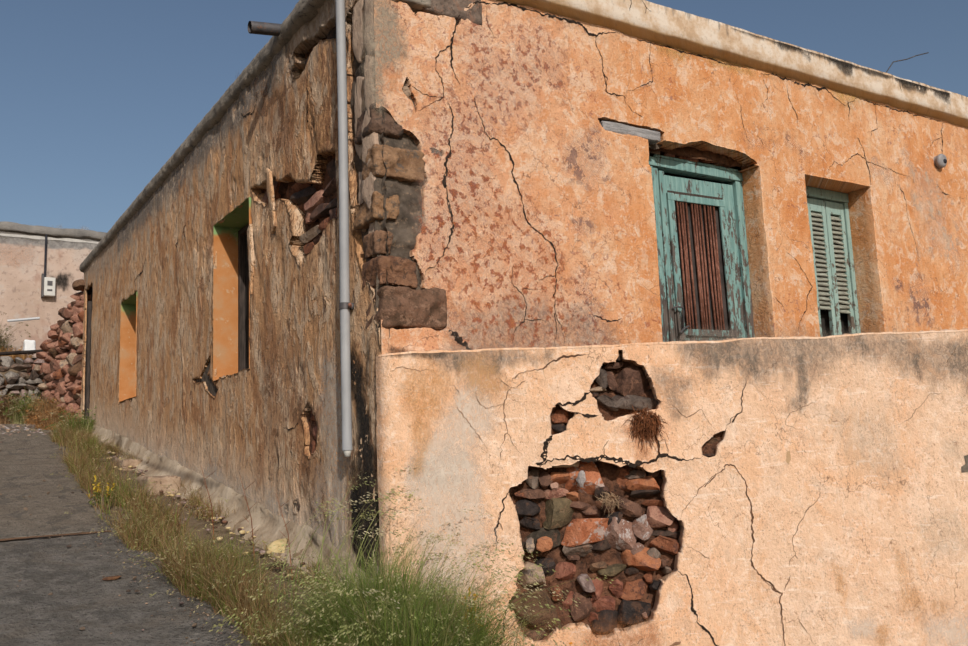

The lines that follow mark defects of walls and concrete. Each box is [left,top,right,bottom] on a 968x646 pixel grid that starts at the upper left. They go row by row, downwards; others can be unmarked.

spalling [261,154,338,256]
spalling [350,0,605,345]
spalling [247,224,255,295]
crack [406,1,943,646]
spalling [285,395,317,487]
spalling [550,404,574,435]
spalling [589,351,669,455]
spalling [702,431,724,457]
spalling [509,460,681,641]